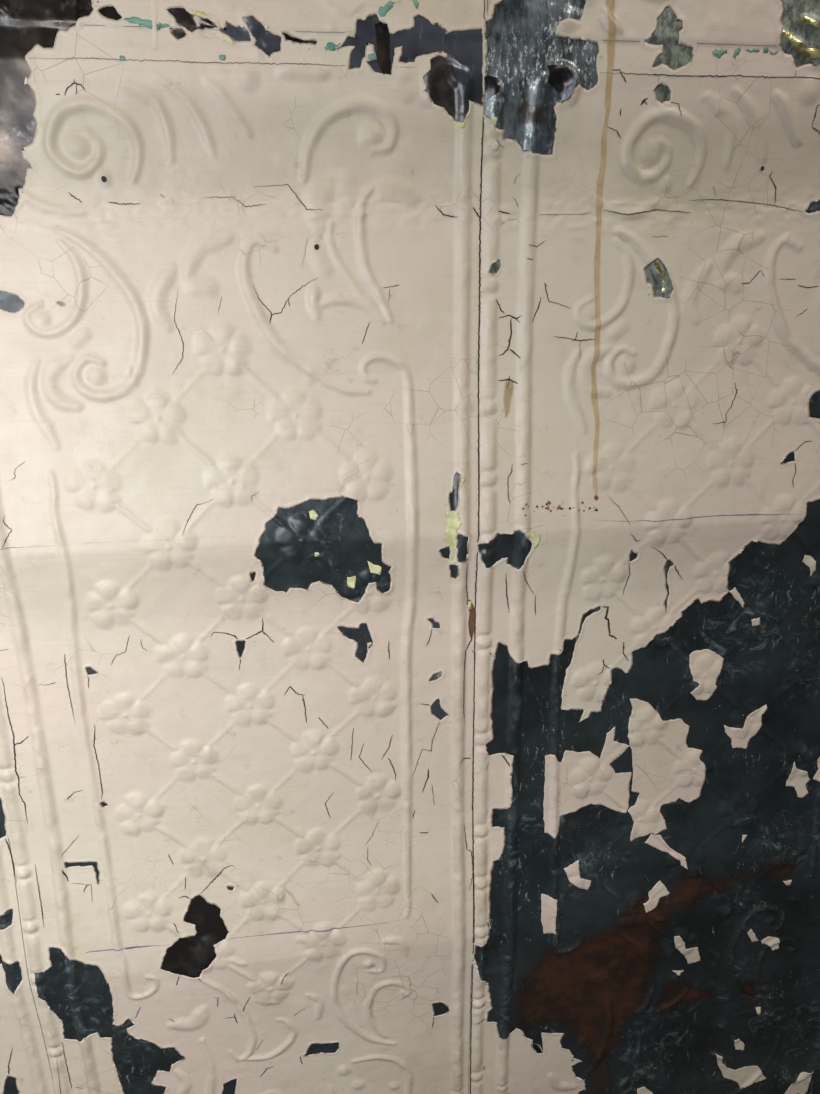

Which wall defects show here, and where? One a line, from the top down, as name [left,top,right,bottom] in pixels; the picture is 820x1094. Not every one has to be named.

peeling [0,0,128,222]
peeling [159,0,606,162]
peeling [774,0,820,75]
peeling [0,286,30,317]
peeling [639,253,677,304]
peeling [245,491,397,606]
peeling [435,525,537,582]
peeling [334,619,377,666]
peeling [471,495,820,1094]
peeling [0,943,188,1094]
peeling [157,882,238,981]
corrosion [519,876,724,1088]